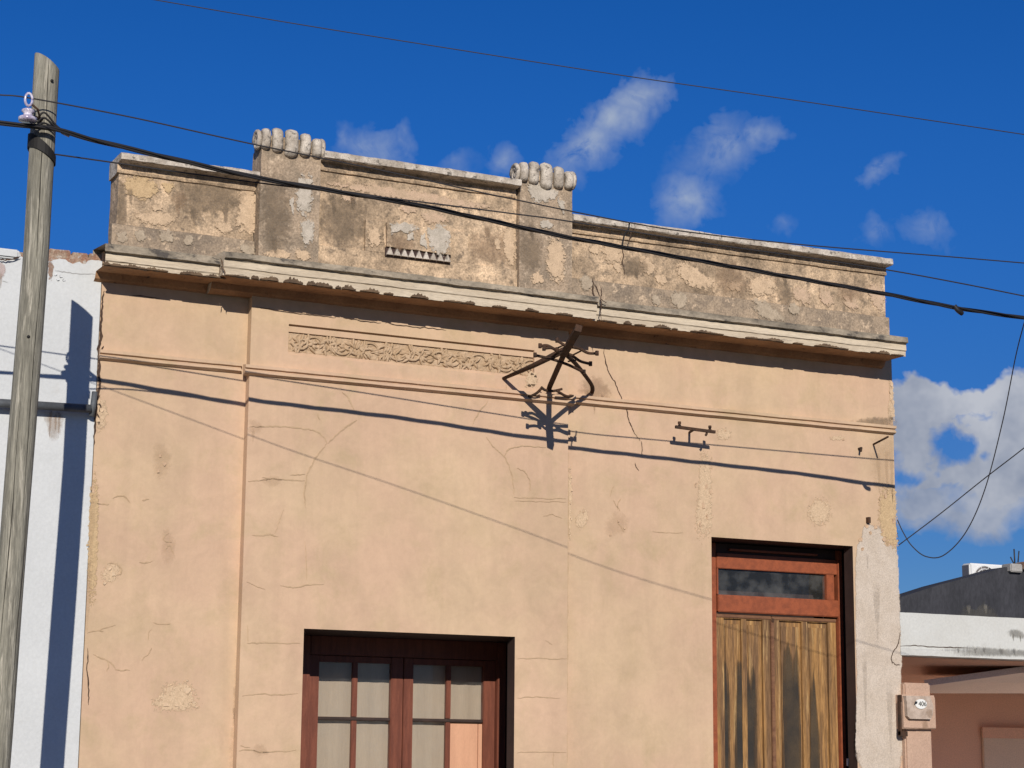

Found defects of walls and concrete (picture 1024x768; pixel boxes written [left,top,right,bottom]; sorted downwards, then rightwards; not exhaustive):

peeling [116,175,193,245]
peeling [215,172,315,261]
peeling [528,182,565,214]
peeling [531,220,567,285]
peeling [589,243,622,273]
spalling [597,320,724,335]
peeling [640,257,886,322]
crack [603,347,643,469]
crack [248,392,357,537]
peeling [695,452,713,539]
crack [86,622,168,705]
peeling [855,487,902,768]